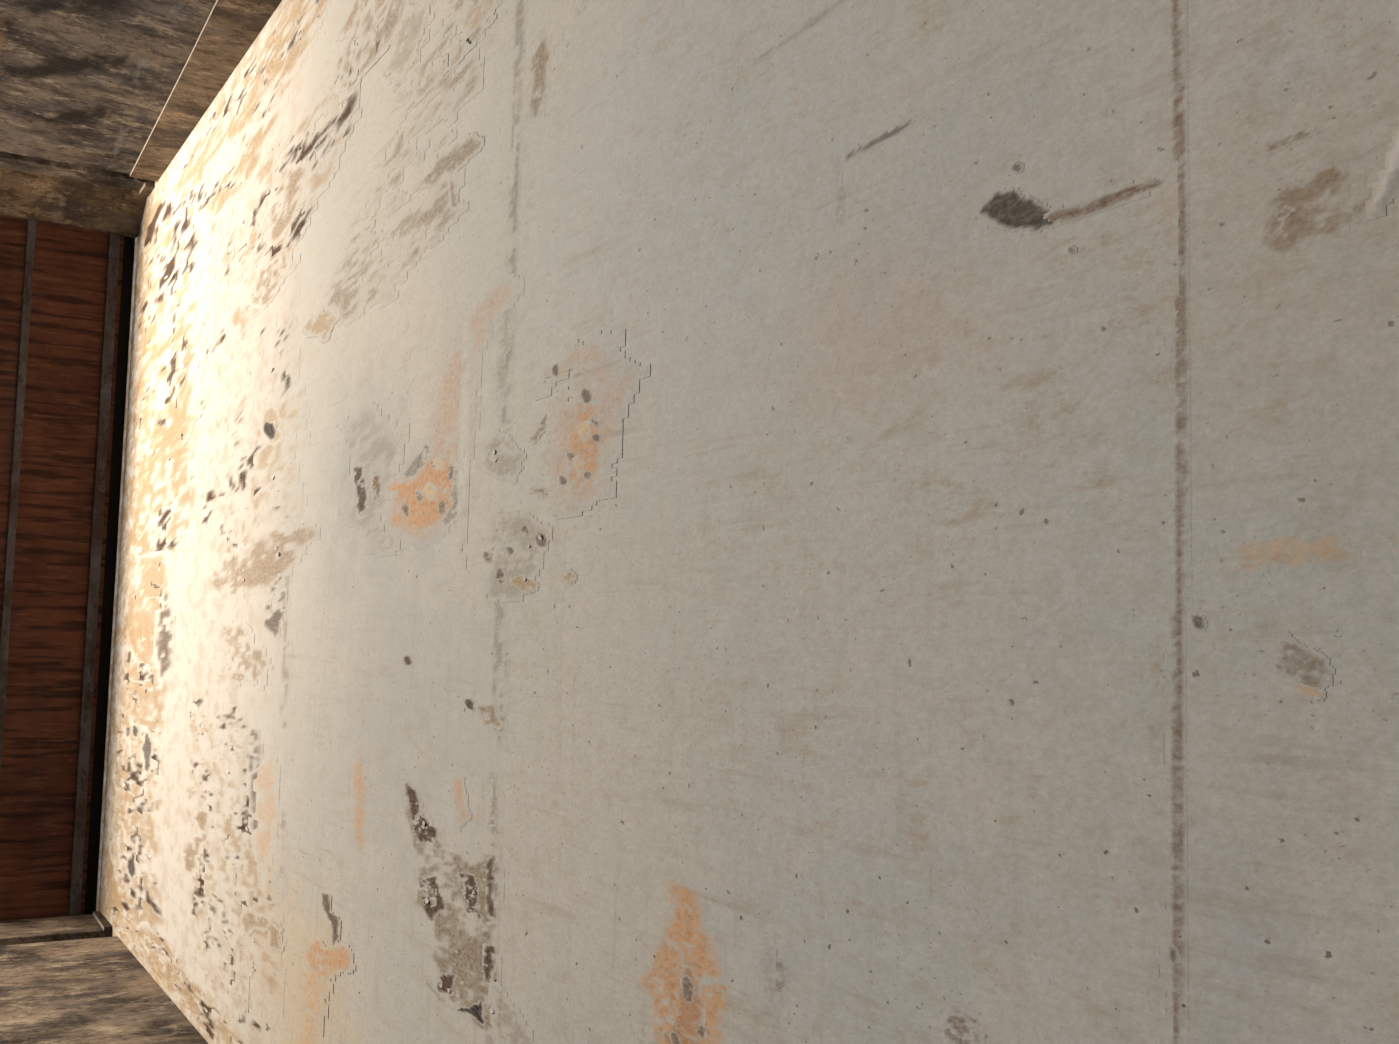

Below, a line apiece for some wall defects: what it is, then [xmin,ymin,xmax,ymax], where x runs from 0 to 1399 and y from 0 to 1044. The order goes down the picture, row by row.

peeling [101,0,503,1044]
rust [381,272,525,570]
peeling [481,411,548,499]
peeling [482,511,553,603]
peeling [403,779,536,1044]
rust [636,871,740,1044]